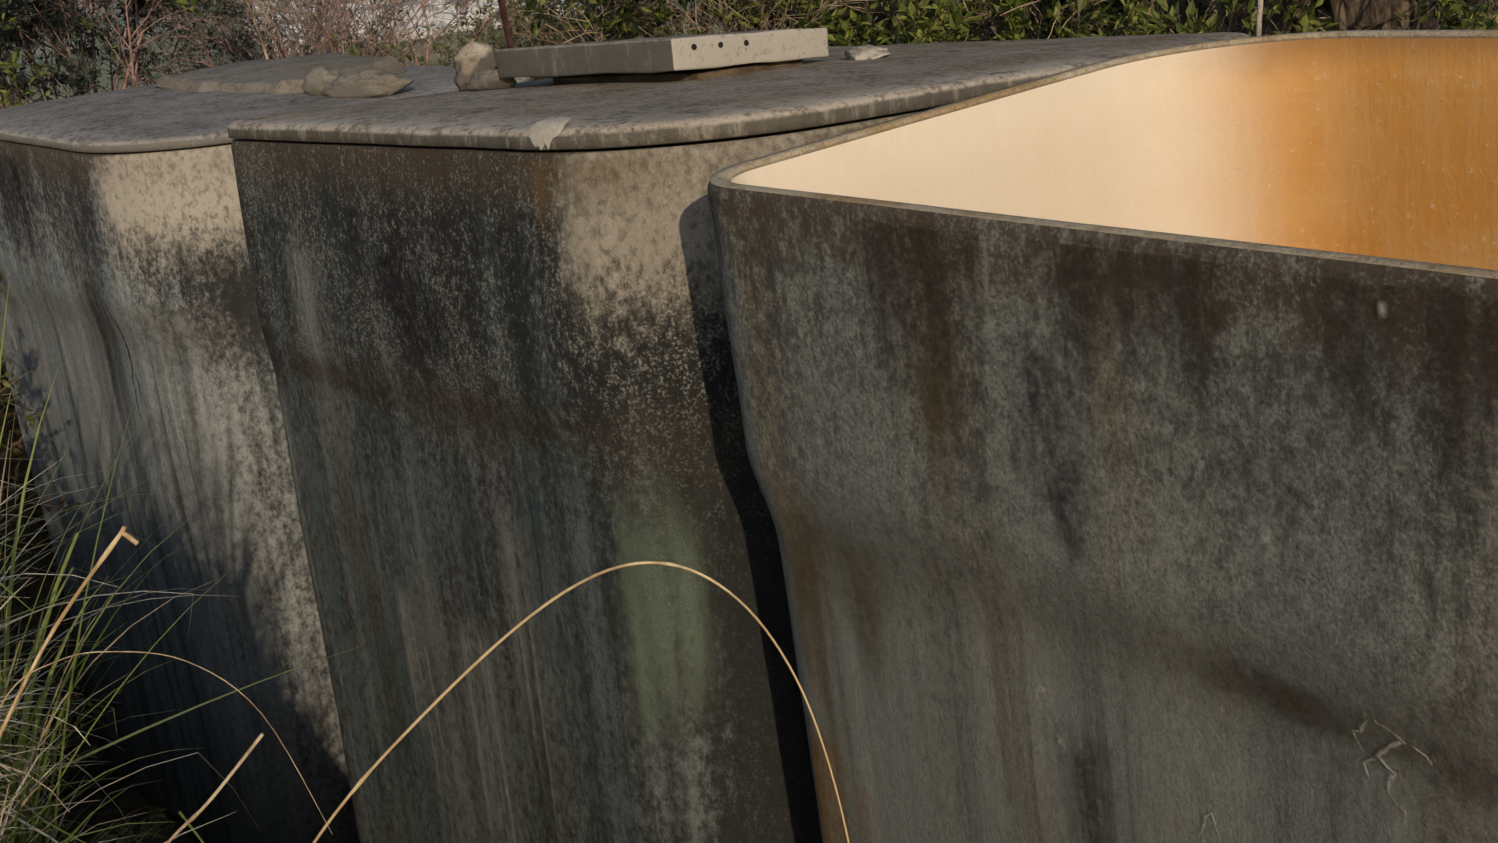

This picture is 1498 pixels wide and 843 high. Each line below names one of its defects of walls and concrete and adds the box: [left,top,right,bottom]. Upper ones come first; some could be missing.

leakage [674,536,704,680]
crack [1352,722,1432,790]